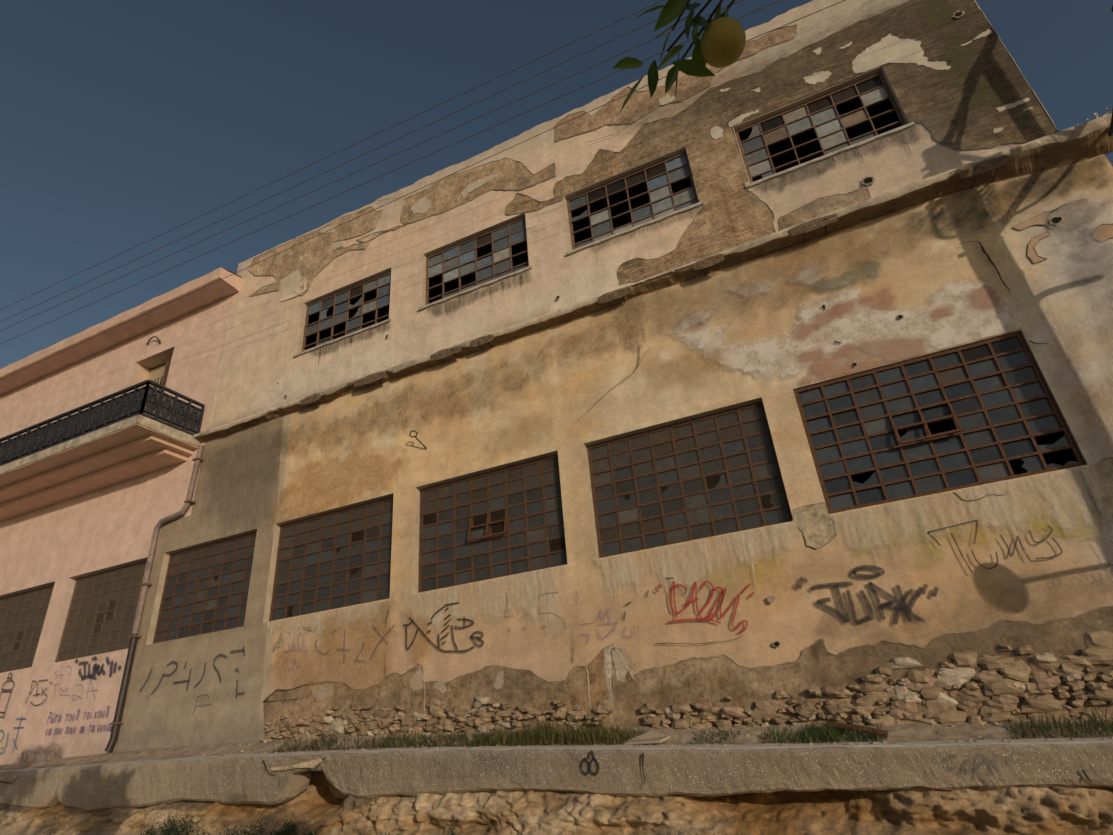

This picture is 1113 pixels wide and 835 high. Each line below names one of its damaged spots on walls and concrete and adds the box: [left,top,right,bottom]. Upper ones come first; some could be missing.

flaking render [248,0,1065,307]
crack [959,241,1011,294]
flaking render [263,605,1113,740]